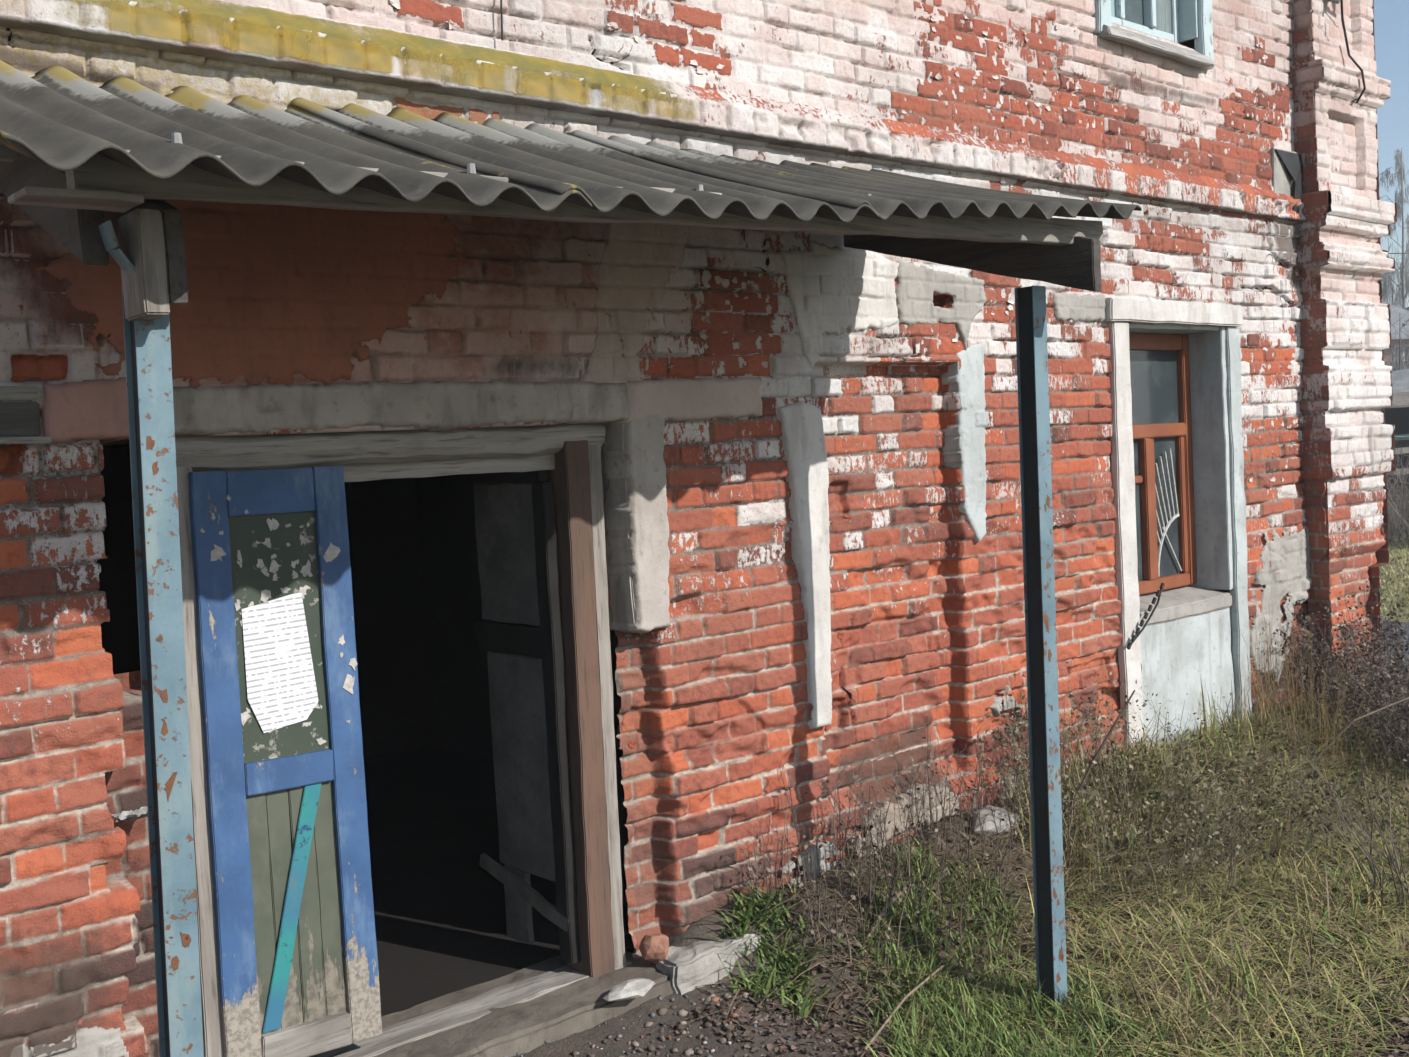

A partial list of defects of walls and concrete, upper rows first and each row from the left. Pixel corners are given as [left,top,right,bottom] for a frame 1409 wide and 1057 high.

water stain [0,50,116,82]
water stain [107,1,694,119]
peeling [606,0,732,90]
peeling [891,0,1296,191]
peeling [972,270,1022,322]
peeling [880,295,978,385]
rust [147,436,159,475]
spalling [825,607,943,732]
rust [160,689,168,736]
spalling [617,696,767,764]
rust [164,772,177,801]
rust [171,932,192,971]